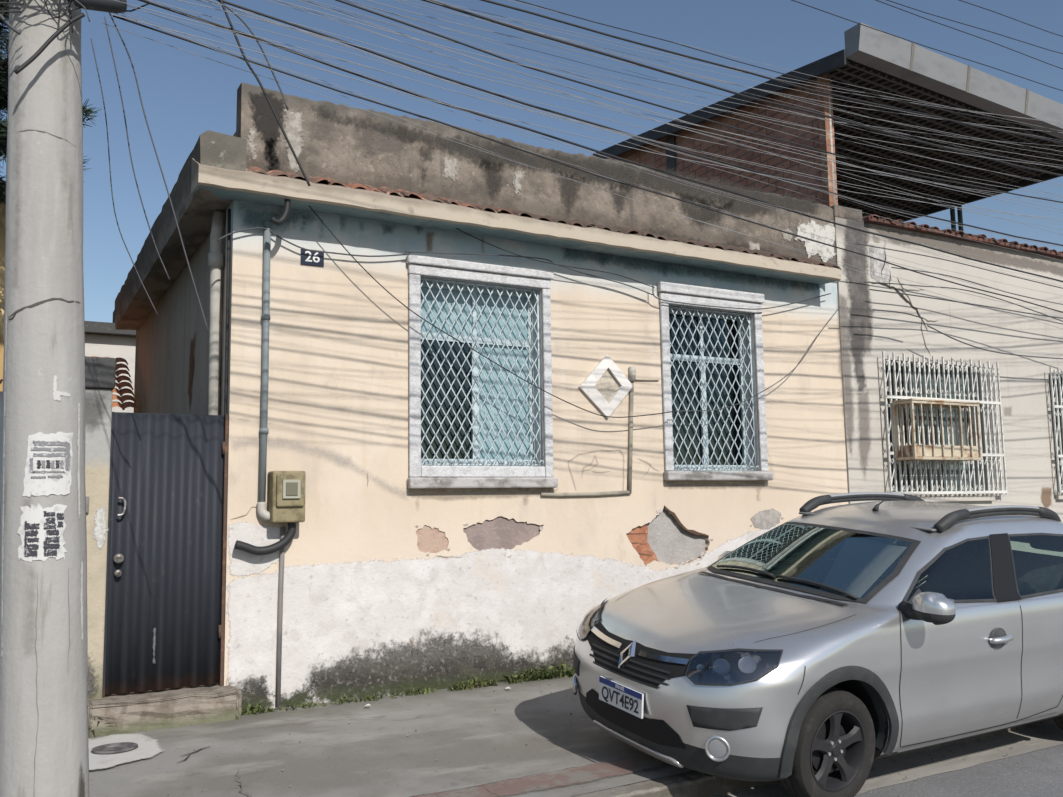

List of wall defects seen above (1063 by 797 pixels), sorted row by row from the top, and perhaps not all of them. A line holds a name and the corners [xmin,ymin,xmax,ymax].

damp [249,92,285,172]
damp [320,107,817,224]
damp [244,210,309,226]
peeling [782,218,836,262]
crack [8,298,80,320]
damp [840,218,1063,467]
peeling [226,506,784,708]
damp [229,633,574,711]